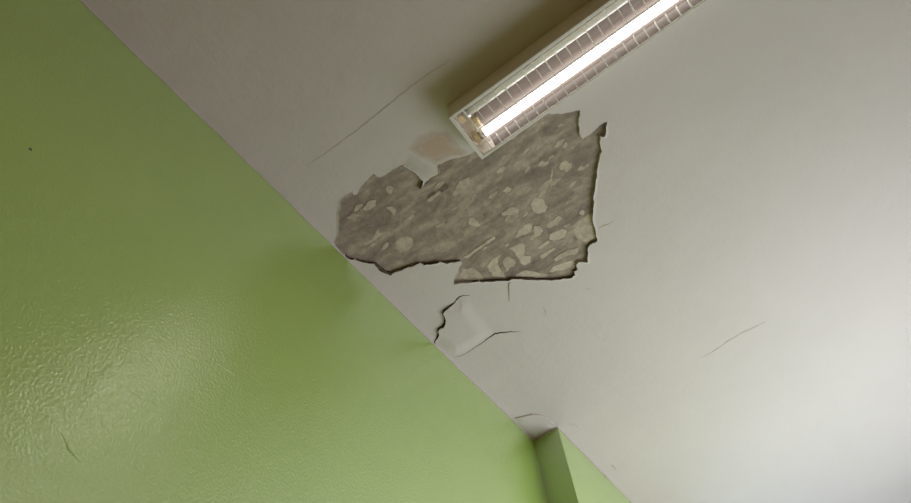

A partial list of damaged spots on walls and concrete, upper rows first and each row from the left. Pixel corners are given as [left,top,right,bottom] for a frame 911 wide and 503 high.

flaking render [334,110,609,285]
crack [434,295,469,343]
crack [458,331,518,357]